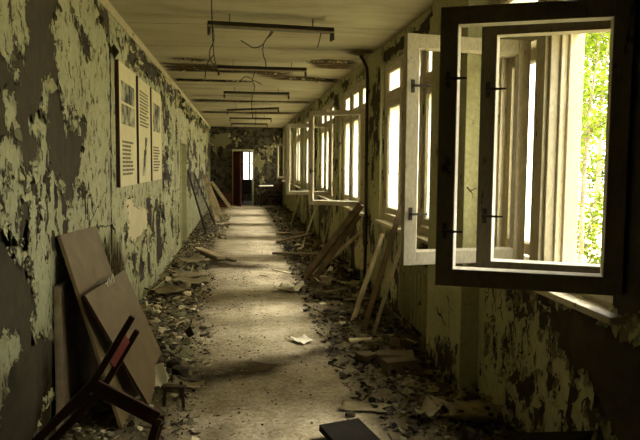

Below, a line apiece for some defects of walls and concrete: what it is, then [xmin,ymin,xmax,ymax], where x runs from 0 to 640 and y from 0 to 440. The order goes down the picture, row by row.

peeling [0,0,95,440]
peeling [94,0,252,285]
peeling [254,135,282,196]
peeling [266,36,404,244]
peeling [412,7,433,34]
peeling [477,0,640,440]